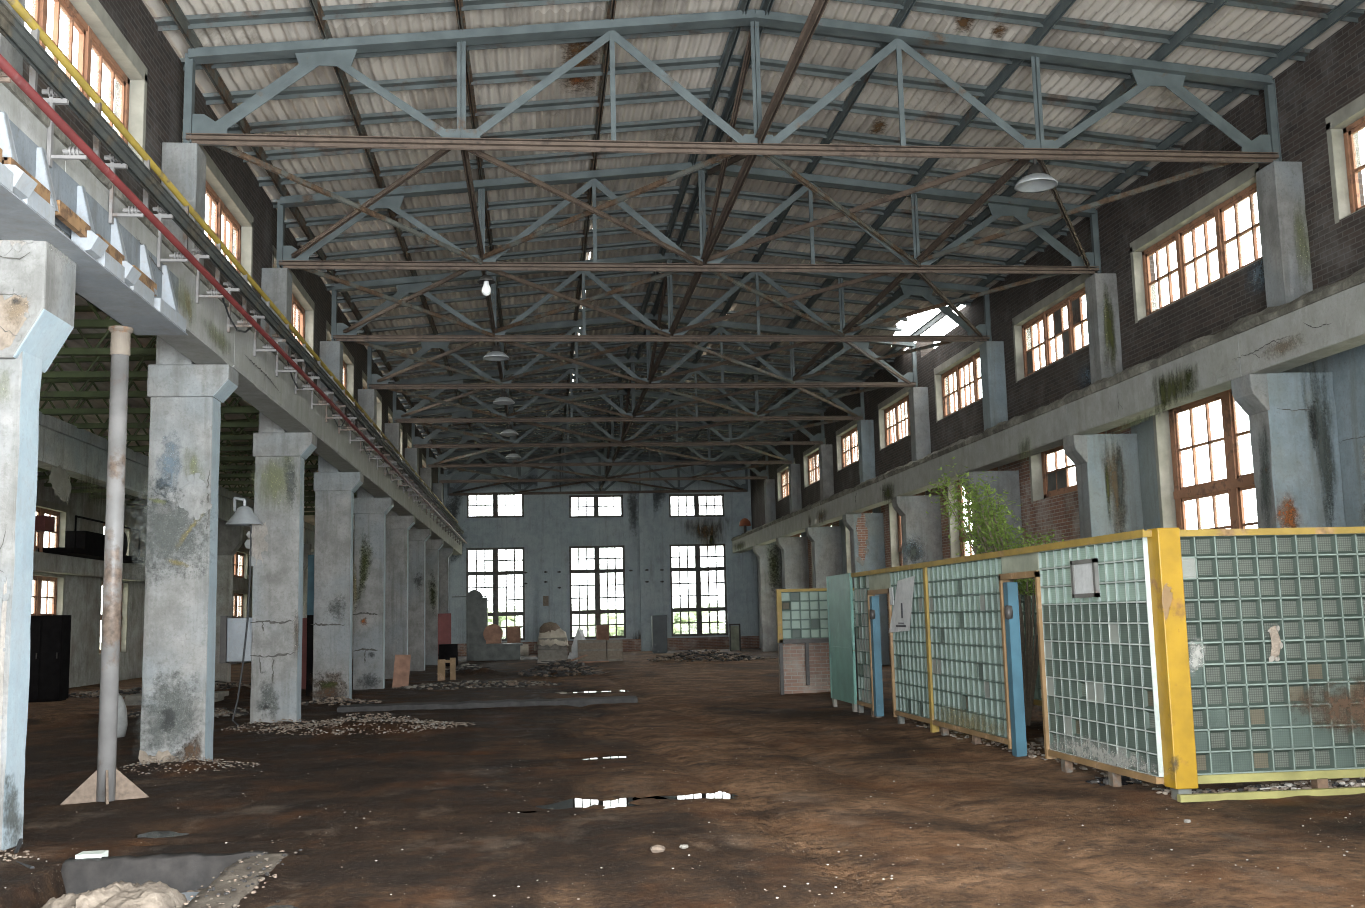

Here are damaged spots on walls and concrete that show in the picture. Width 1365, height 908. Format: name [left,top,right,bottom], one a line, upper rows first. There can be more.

spalling [0,240,34,260]
spalling [0,286,30,350]
crack [1234,323,1329,359]
water stain [1310,371,1335,520]
water stain [132,437,209,575]
water stain [1105,451,1124,517]
corrosion [1277,498,1298,528]
crack [250,612,378,683]
water stain [141,672,194,749]